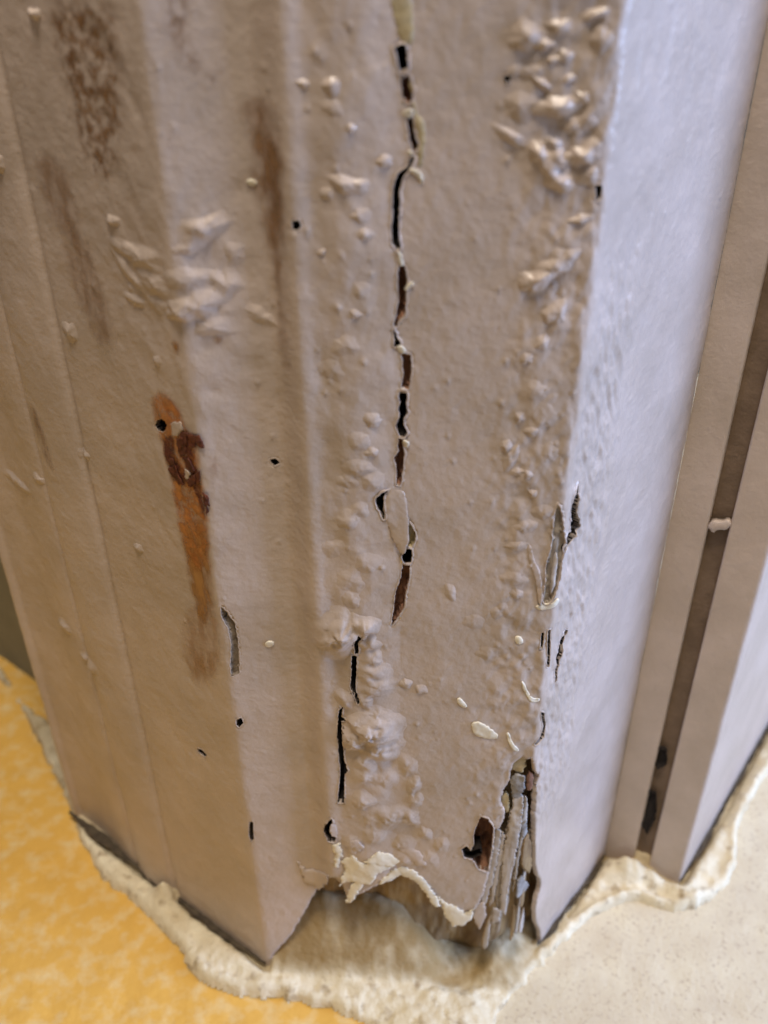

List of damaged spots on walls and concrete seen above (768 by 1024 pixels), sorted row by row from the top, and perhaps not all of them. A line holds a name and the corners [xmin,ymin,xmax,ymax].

crack [374,0,427,627]
corrosion [154,396,211,619]
crack [561,481,582,556]
crack [336,636,363,804]
crack [506,628,569,752]
peeling [296,824,487,929]